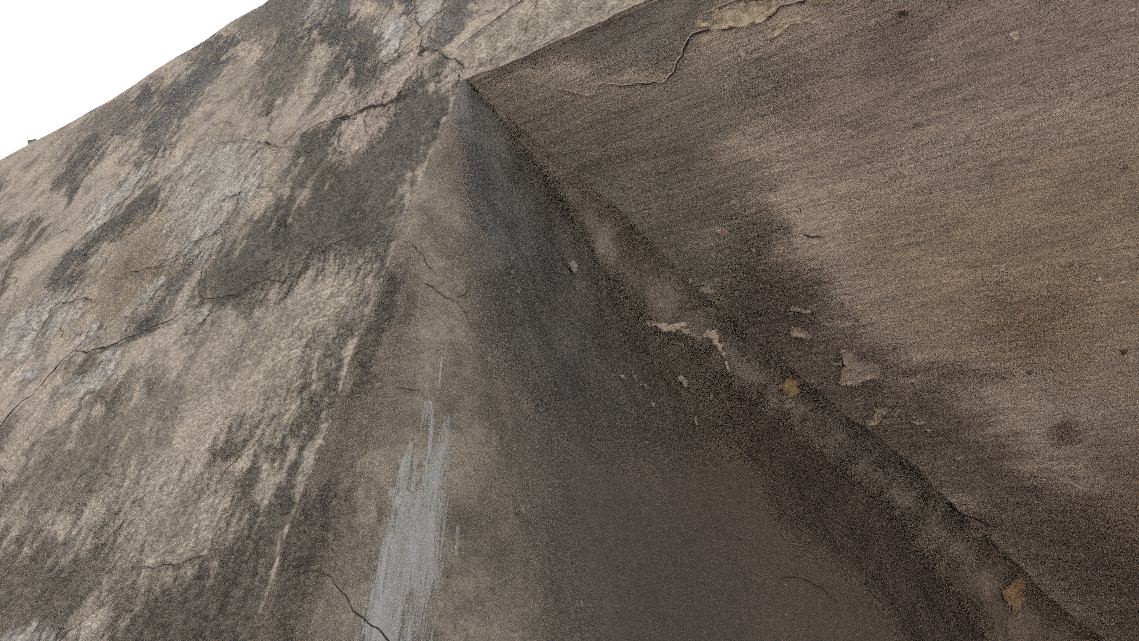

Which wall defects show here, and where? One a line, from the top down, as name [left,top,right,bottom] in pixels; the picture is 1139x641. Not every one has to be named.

crack [557,0,807,96]
water stain [471,0,1139,641]
water stain [396,442,415,491]
crack [302,569,389,641]